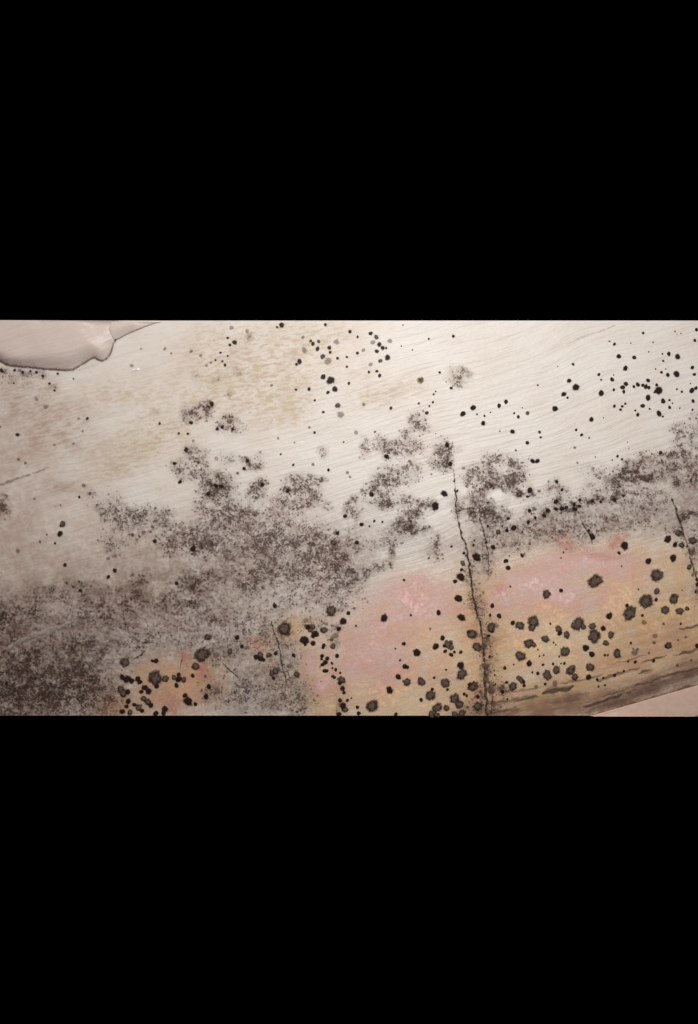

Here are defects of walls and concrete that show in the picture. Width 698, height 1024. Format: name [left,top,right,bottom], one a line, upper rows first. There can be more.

leakage [0,330,698,718]
crack [453,469,493,715]
crack [671,497,698,583]